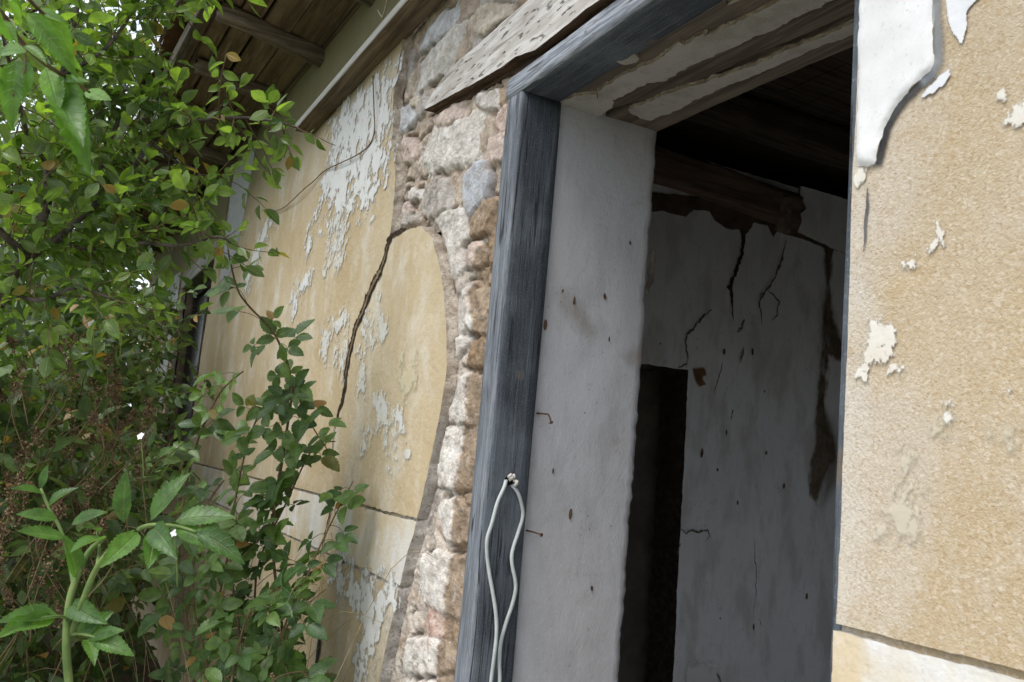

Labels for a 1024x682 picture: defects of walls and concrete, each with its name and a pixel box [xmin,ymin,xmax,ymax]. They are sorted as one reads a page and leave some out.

peeling [560,0,854,121]
peeling [921,69,951,98]
peeling [946,0,976,44]
peeling [996,88,1024,129]
peeling [244,217,276,298]
peeling [901,220,945,272]
crack [331,228,407,475]
spalling [289,0,527,682]
crack [678,226,786,420]
water stain [809,247,842,500]
peeling [854,317,907,382]